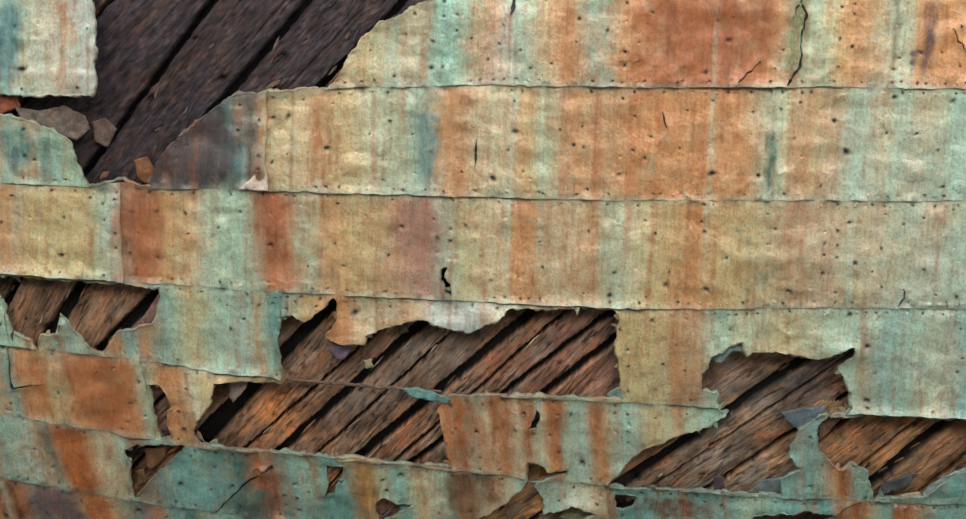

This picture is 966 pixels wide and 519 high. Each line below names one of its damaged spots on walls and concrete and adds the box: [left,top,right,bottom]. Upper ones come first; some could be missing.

crack [787,0,809,86]
crack [738,59,761,83]
peeling [0,96,117,148]
peeling [134,145,157,184]
peeling [136,294,160,327]
peeling [327,339,353,360]
peeling [712,343,743,364]
peeling [229,381,247,402]
peeling [287,378,450,404]
peeling [781,406,846,440]
peeling [852,464,966,503]
peeling [559,507,593,519]